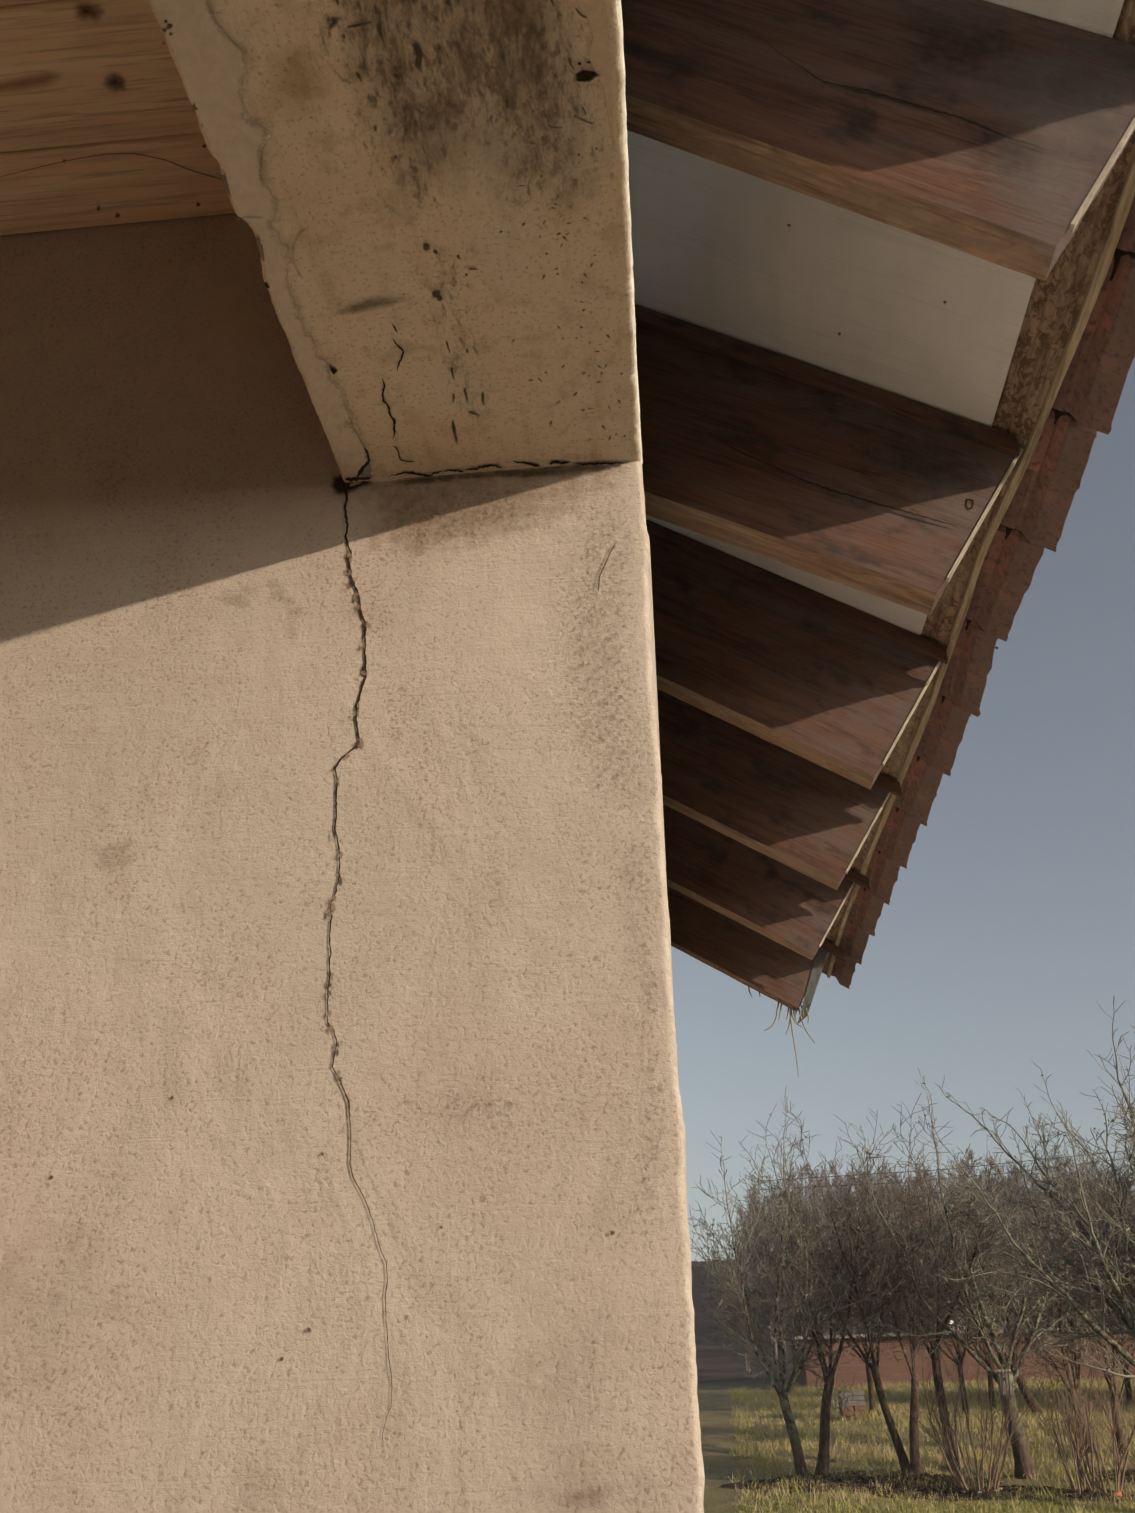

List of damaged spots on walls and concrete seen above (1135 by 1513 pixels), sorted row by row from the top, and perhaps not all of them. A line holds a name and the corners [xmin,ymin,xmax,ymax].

water stain [327,0,597,197]
crack [381,324,628,483]
crack [327,493,392,1447]